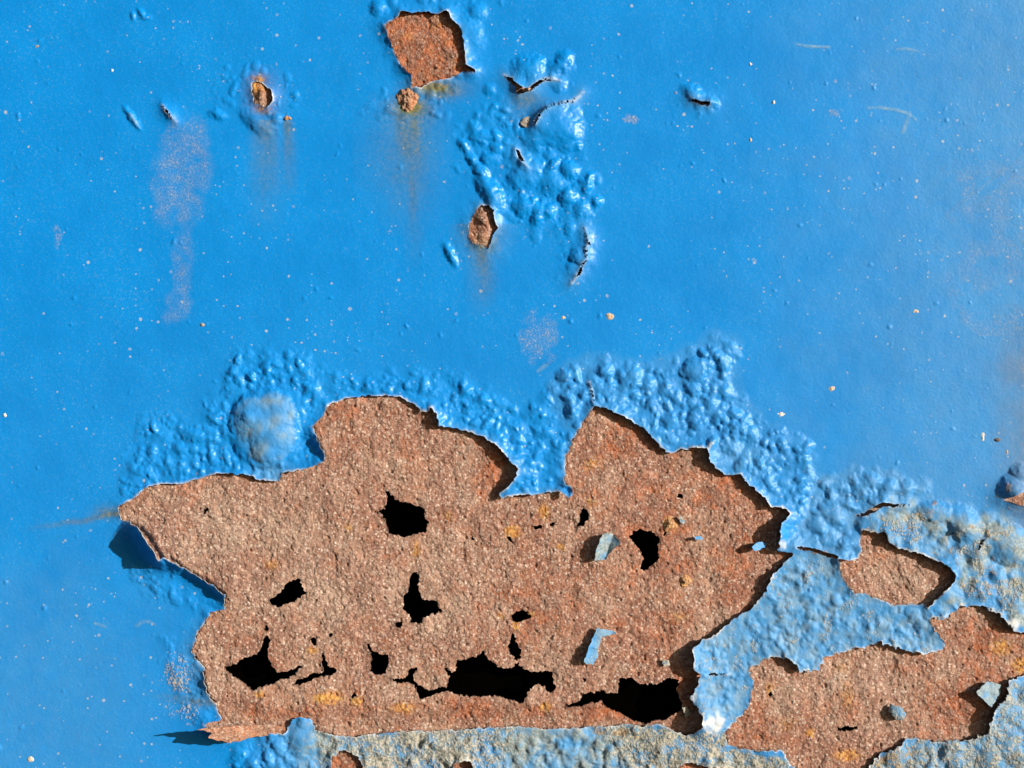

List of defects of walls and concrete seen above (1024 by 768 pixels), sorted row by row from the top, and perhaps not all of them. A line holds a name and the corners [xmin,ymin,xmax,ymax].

peeling [375,0,486,98]
peeling [246,74,280,115]
crack [497,68,588,172]
crack [684,90,716,112]
peeling [461,197,506,259]
crack [565,222,594,289]
peeling [107,384,1024,768]